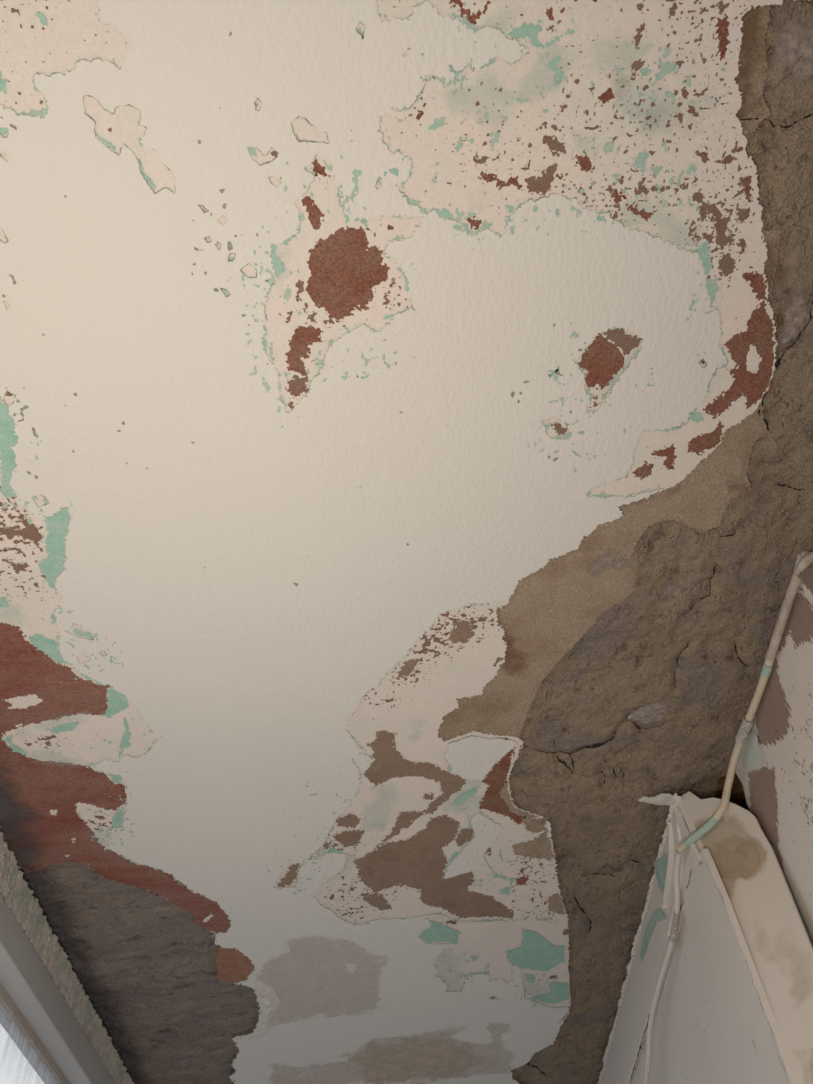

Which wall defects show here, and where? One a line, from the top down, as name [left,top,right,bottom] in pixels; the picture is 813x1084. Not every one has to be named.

peeling [0,0,131,119]
peeling [83,95,176,194]
crack [758,295,813,430]
flaking render [204,0,813,1084]
flaking render [0,387,258,1084]
leakage [695,818,765,894]